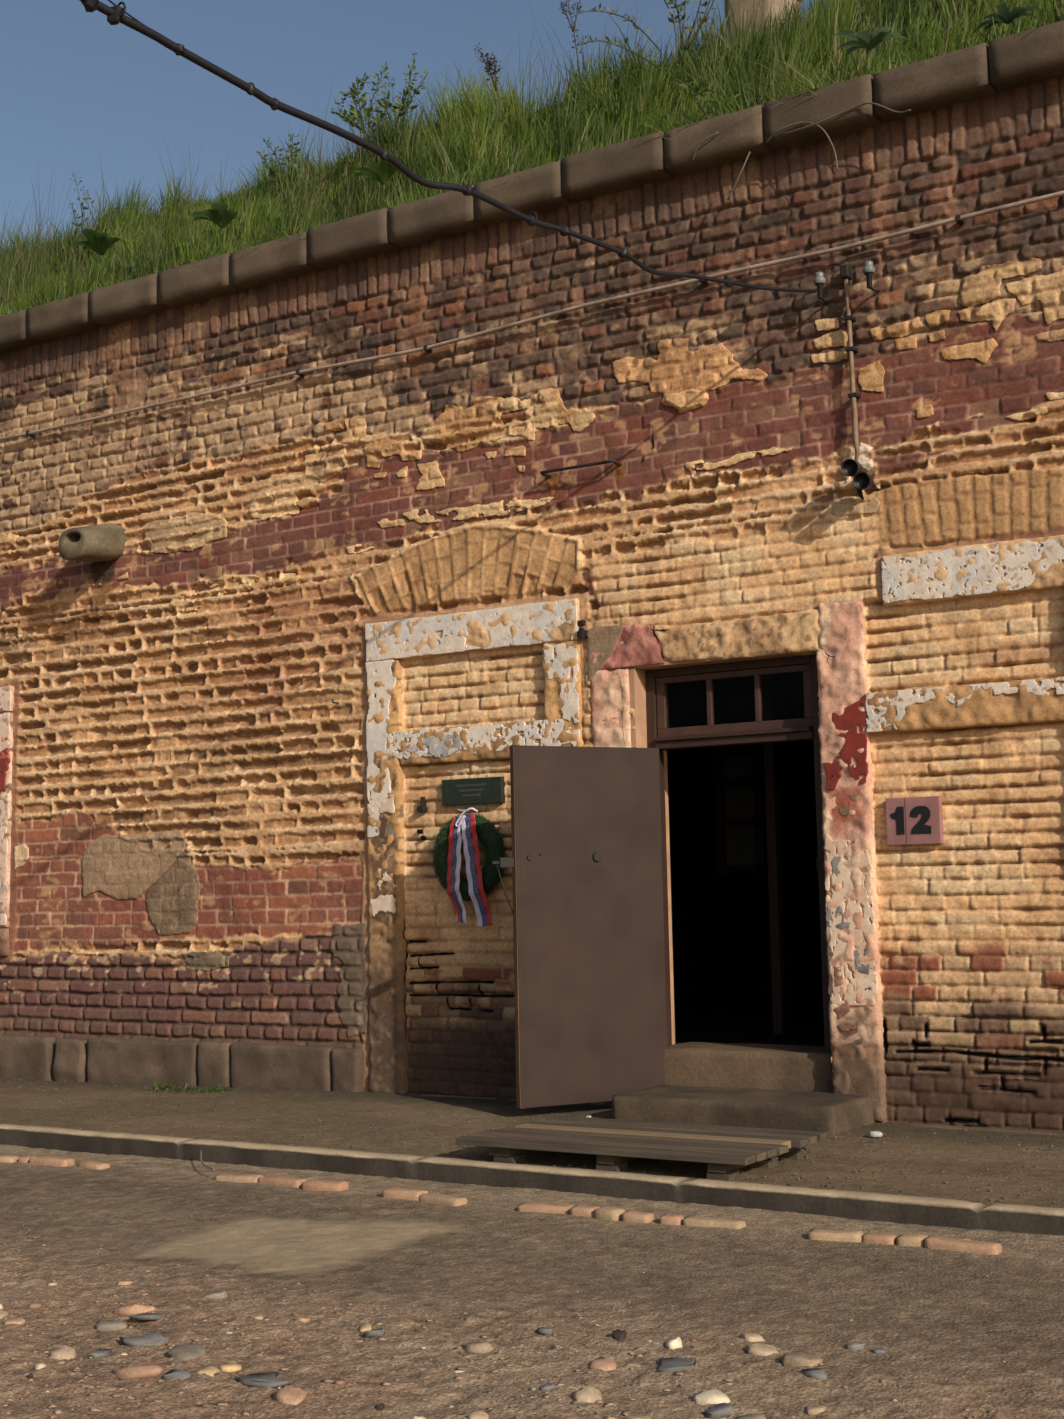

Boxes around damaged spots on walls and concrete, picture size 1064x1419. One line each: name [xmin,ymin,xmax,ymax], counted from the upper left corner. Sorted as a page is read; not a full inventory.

peeling [870,257,1064,363]
peeling [612,338,768,413]
peeling [811,318,885,392]
peeling [248,388,596,521]
peeling [685,447,792,478]
peeling [378,497,554,528]
peeling [881,539,1064,603]
peeling [0,687,12,752]
peeling [365,599,580,838]
peeling [865,677,1064,732]
peeling [370,869,398,916]
peeling [825,834,878,1032]